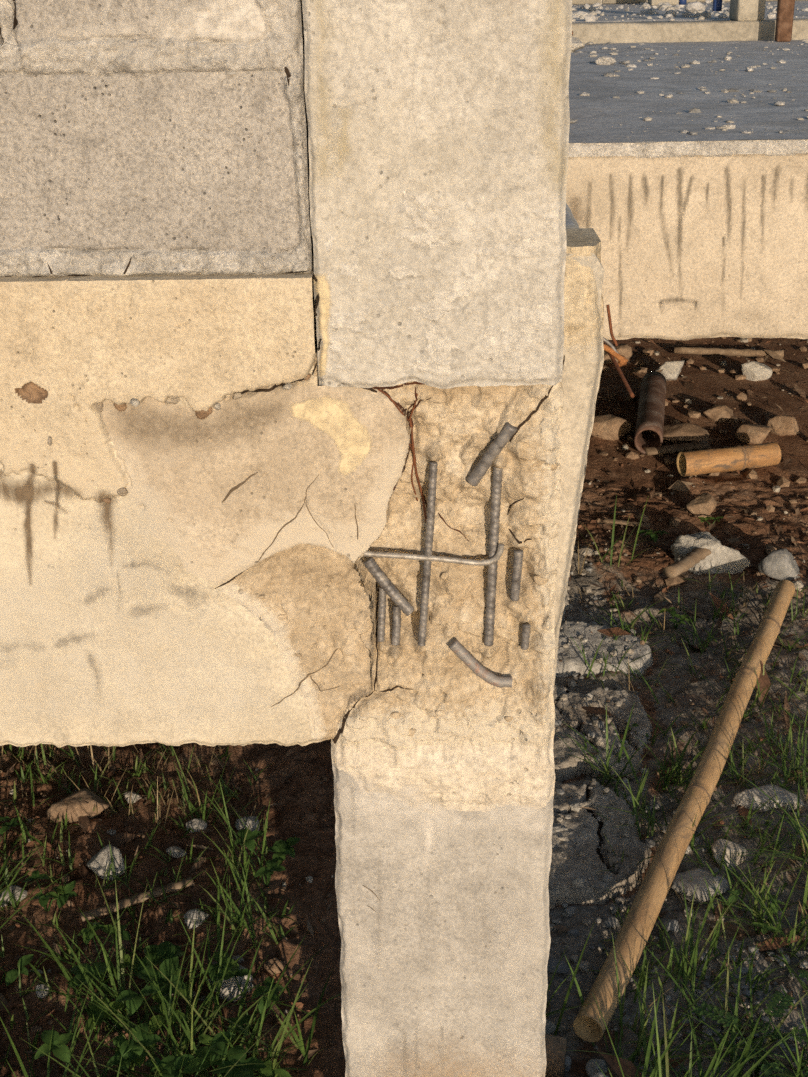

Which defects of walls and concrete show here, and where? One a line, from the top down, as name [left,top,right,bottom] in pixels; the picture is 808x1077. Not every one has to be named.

crack [2,263,91,277]
peeling [396,191,452,248]
leakage [667,170,691,246]
crack [241,270,322,394]
spalling [14,382,48,404]
leakage [0,462,71,568]
leakage [99,494,111,541]
crack [215,472,358,589]
spalling [94,212,604,751]
crack [270,582,412,744]